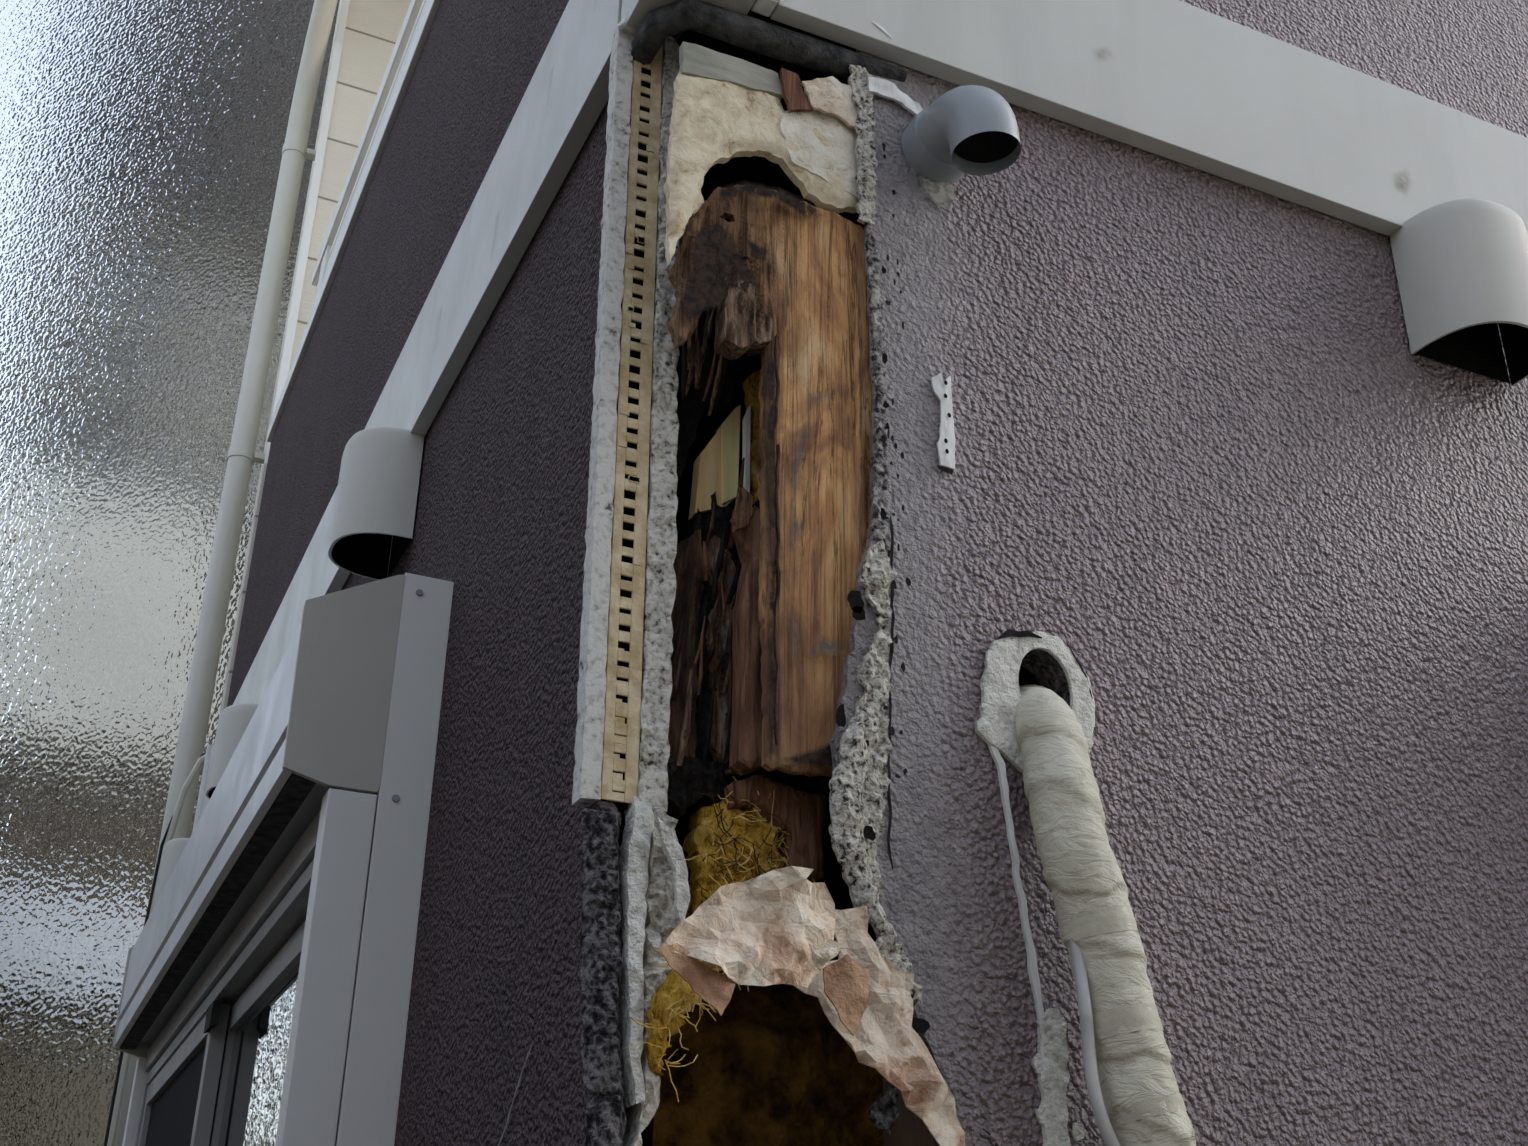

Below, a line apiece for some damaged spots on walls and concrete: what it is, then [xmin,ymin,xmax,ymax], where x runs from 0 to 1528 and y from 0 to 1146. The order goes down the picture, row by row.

spalling [829,65,931,1034]
spalling [975,629,1095,774]
spalling [579,795,691,1146]
spalling [868,1085,900,1135]